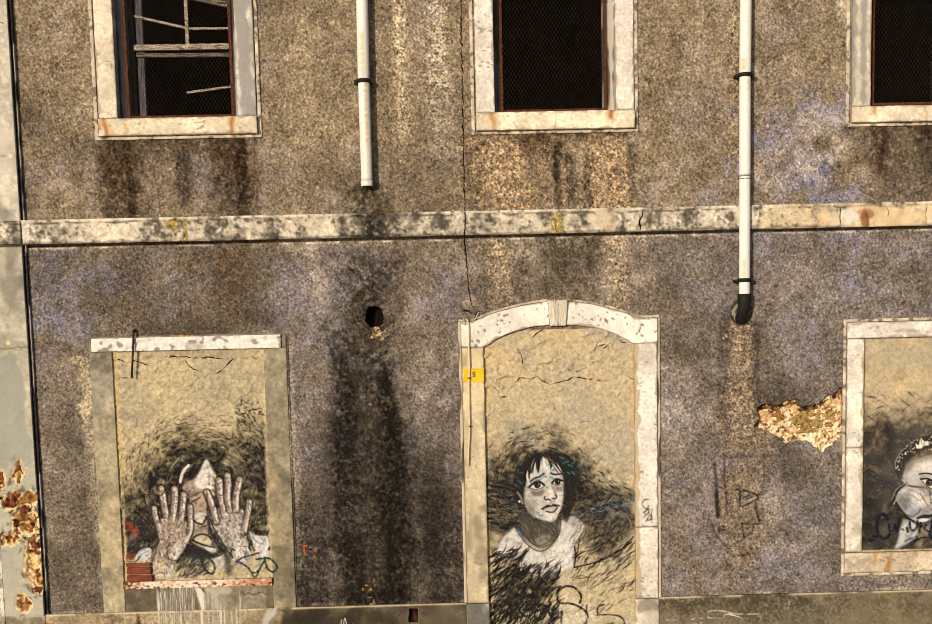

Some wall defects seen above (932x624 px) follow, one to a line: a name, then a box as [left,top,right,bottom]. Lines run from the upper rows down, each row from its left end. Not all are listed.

crack [458,0,480,322]
rust [873,127,890,154]
water stain [340,187,396,238]
hole [365,306,386,341]
water stain [294,261,416,607]
spalling [754,388,842,453]
spalling [0,458,43,614]
water stain [425,516,463,603]